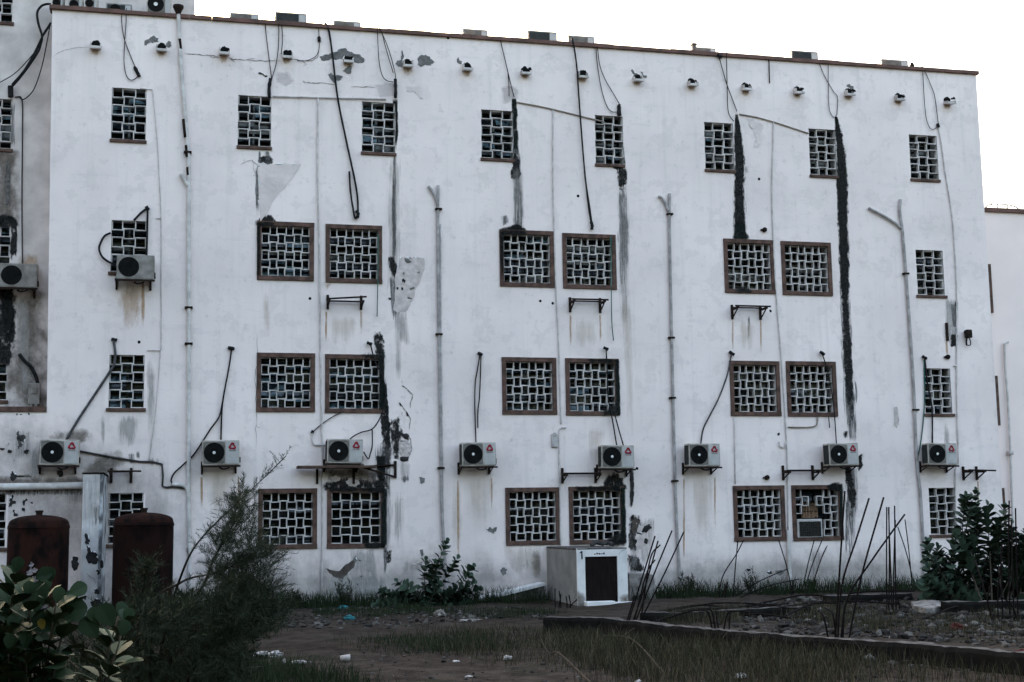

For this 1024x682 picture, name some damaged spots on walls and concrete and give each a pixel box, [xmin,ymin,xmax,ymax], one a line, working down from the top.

spalling [320,47,365,83]
spalling [417,55,435,67]
water stain [0,161,18,258]
peeling [256,163,301,221]
water stain [500,99,526,275]
water stain [733,114,749,239]
peeling [388,256,425,313]
water stain [835,117,857,438]
water stain [0,289,29,388]
water stain [576,470,634,546]